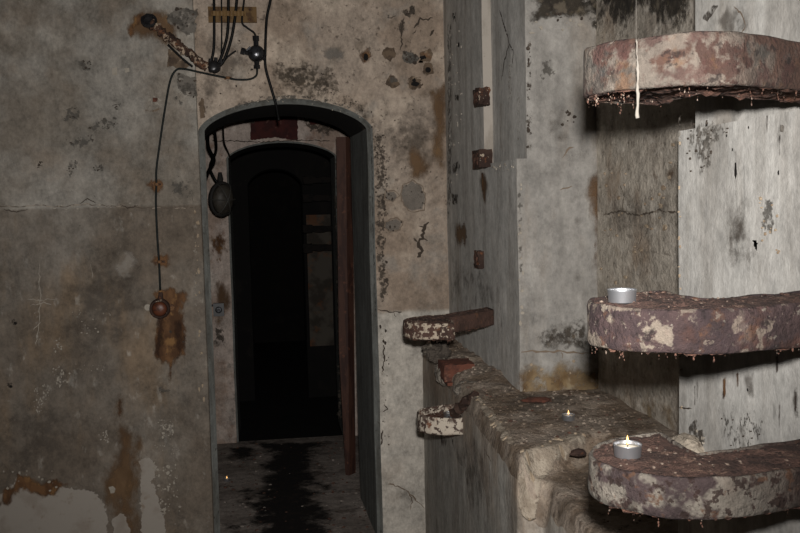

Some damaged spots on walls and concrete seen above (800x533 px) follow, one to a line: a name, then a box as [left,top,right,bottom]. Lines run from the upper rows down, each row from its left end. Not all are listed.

crack [500,12,514,76]
water stain [384,85,445,177]
rust [587,90,636,114]
flaking render [374,135,426,302]
crack [414,222,429,258]
crack [604,186,676,250]
rust [154,288,187,379]
water stain [522,359,598,403]
peeling [0,457,182,533]